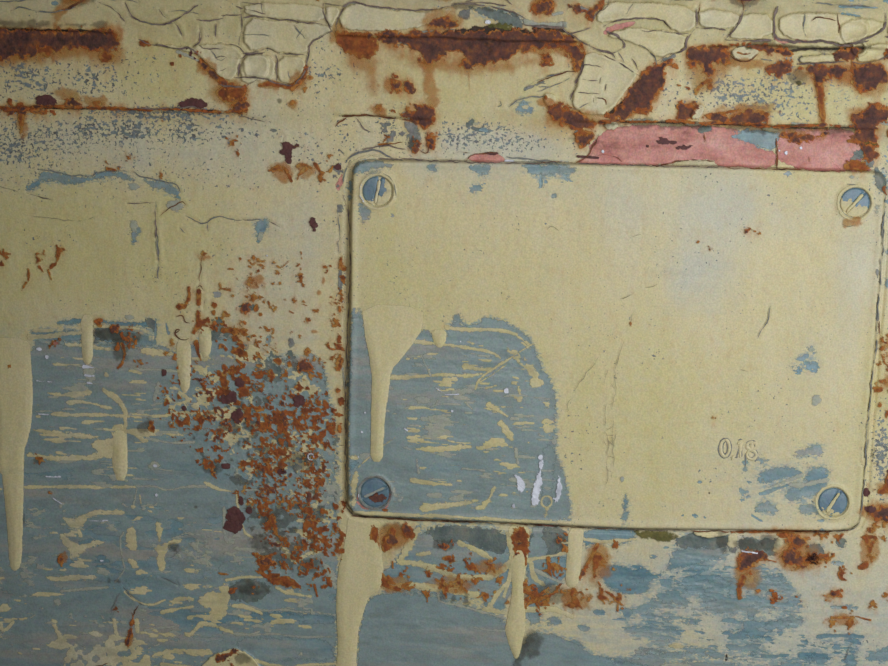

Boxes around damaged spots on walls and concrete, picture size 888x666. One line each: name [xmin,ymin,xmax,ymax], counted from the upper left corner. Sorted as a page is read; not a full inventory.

corrosion [0,0,122,63]
corrosion [331,0,605,154]
crack [99,0,888,109]
peeling [466,53,888,254]
corrosion [598,39,888,163]
peeling [0,318,340,666]
corrosion [148,251,347,603]
corrosion [354,515,477,553]
corrosion [381,539,504,602]
corrosion [523,533,631,616]
peeling [346,308,888,666]
corrosion [728,470,888,635]